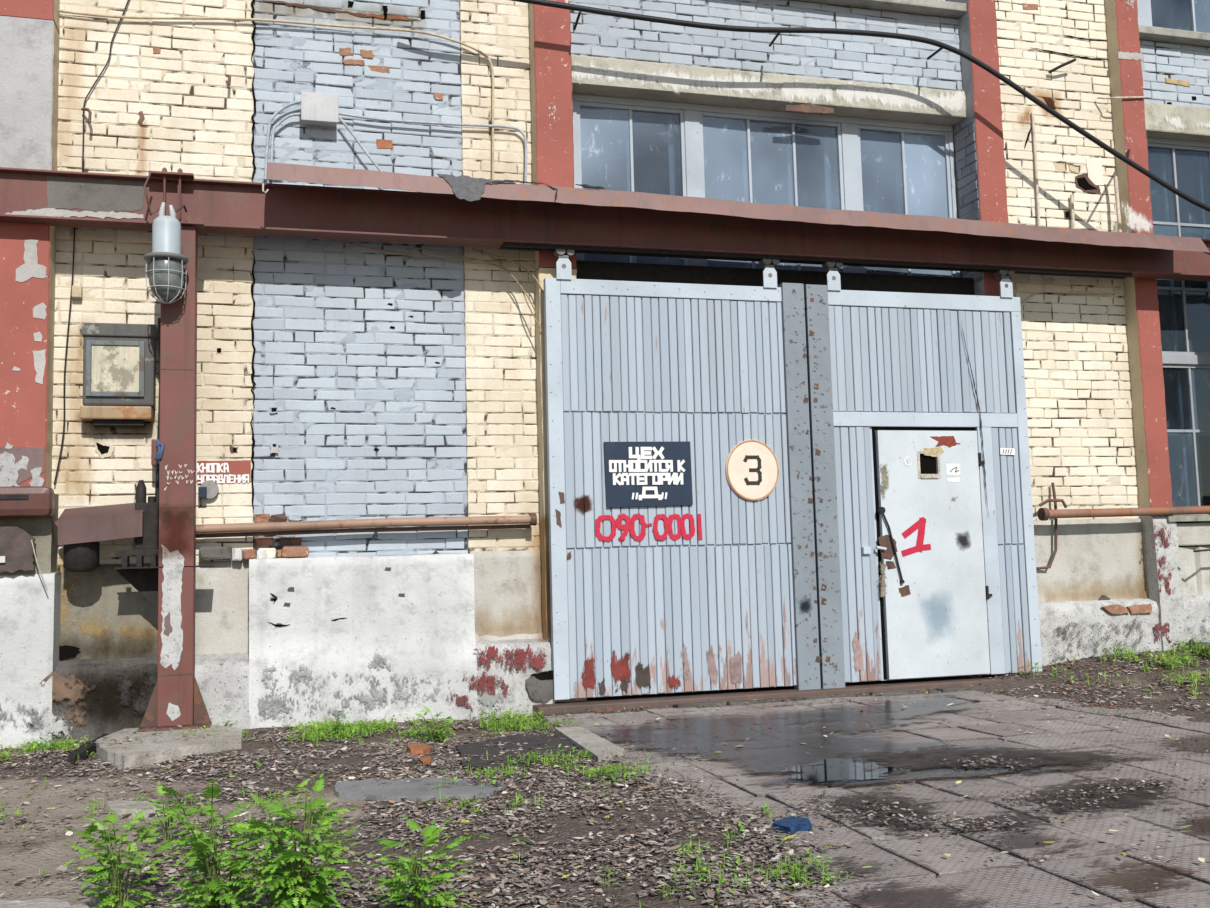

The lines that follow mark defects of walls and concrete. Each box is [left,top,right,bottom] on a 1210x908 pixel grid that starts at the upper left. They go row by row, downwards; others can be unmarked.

damp [572,62,966,112]
peeling [1054,157,1104,193]
peeling [15,240,47,282]
peeling [12,303,47,384]
peeling [0,442,45,487]
peeling [160,545,184,670]
peeling [167,703,181,721]